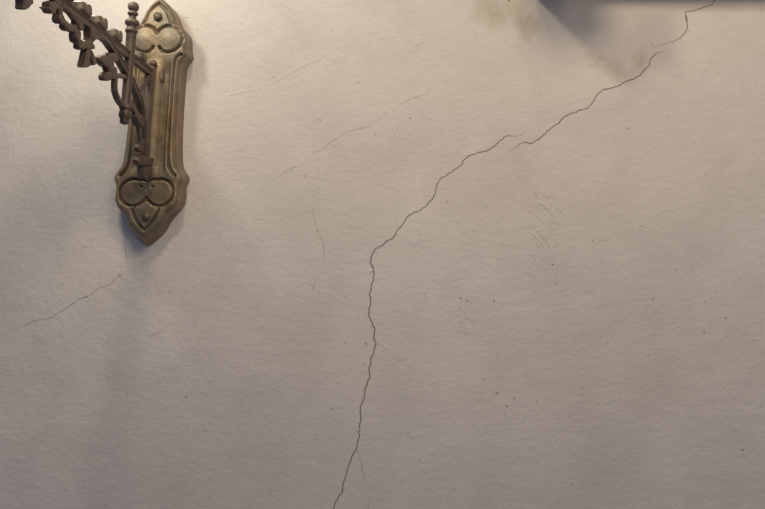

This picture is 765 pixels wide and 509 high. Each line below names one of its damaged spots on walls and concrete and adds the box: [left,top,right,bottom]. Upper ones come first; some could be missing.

crack [334,54,655,506]